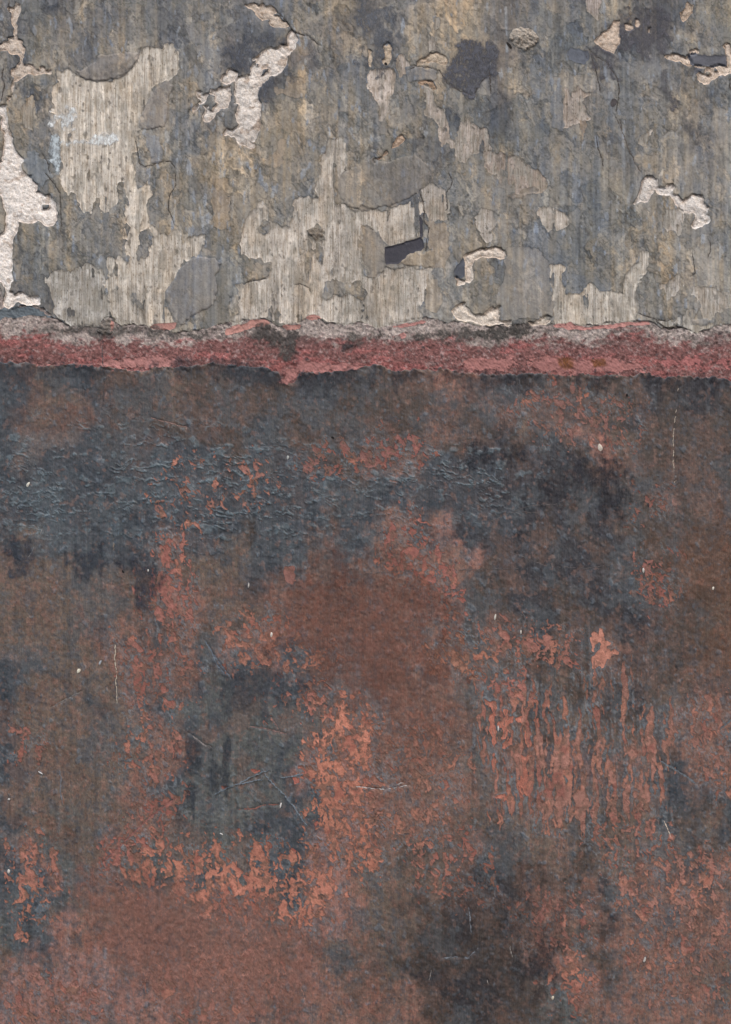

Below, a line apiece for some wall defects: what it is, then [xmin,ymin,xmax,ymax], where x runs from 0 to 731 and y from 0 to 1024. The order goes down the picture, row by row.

spalling [192,3,298,149]
peeling [366,17,448,121]
spalling [586,0,650,54]
spalling [664,43,731,85]
peeling [0,2,221,331]
peeling [225,135,450,339]
spalling [454,209,506,286]
peeling [418,80,548,194]
peeling [537,206,570,232]
spalling [633,176,711,236]
spalling [451,303,512,327]
peeling [528,250,731,334]